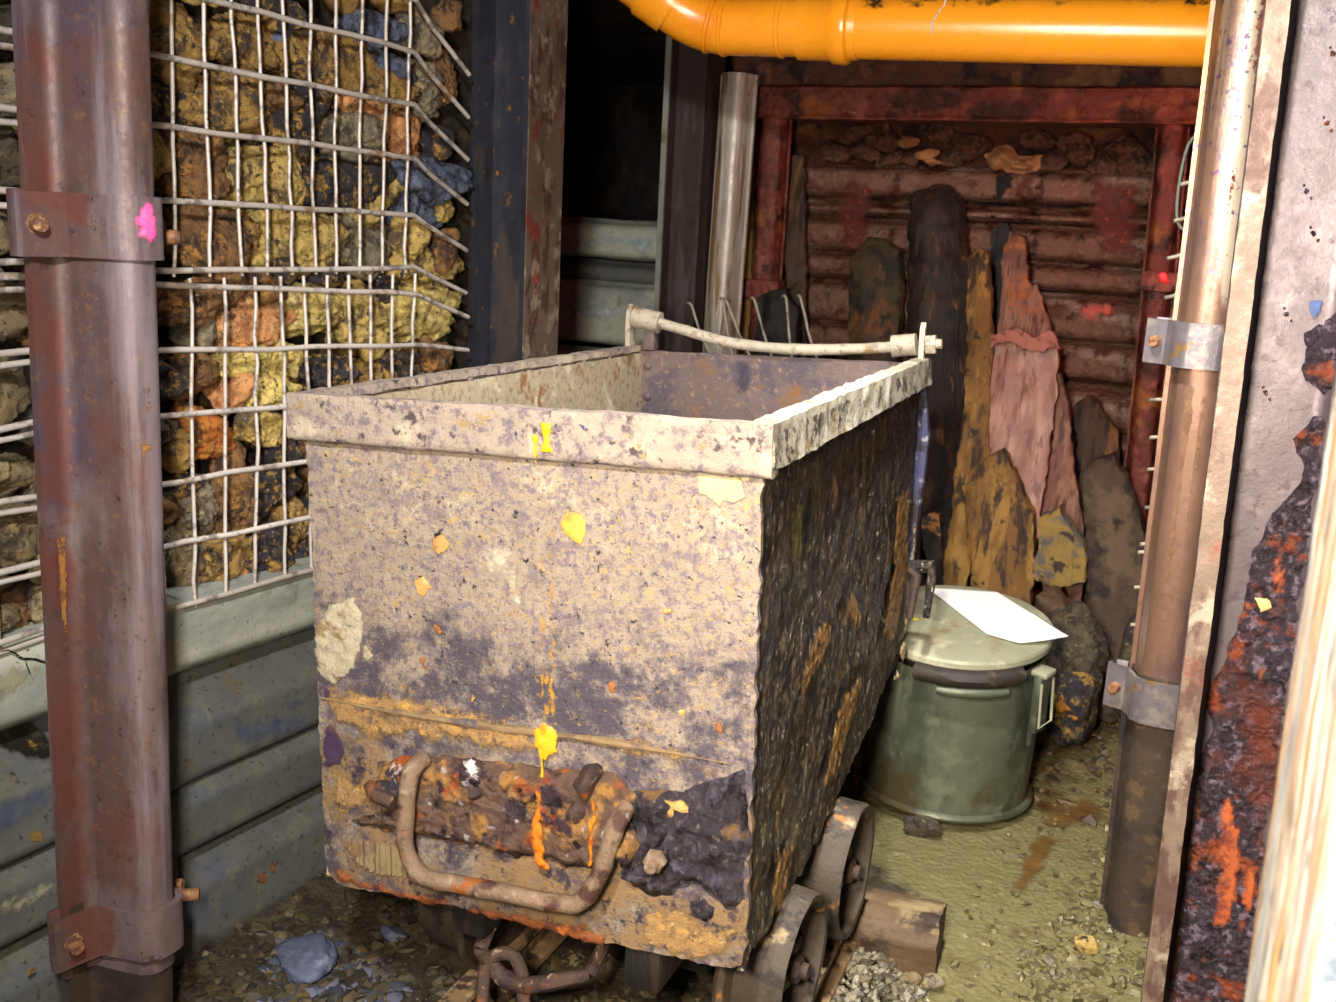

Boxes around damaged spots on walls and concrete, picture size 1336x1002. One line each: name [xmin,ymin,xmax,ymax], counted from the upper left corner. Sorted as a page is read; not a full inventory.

corrosion [57,521,68,646]
corrosion [1255,559,1284,612]
corrosion [1214,799,1255,925]